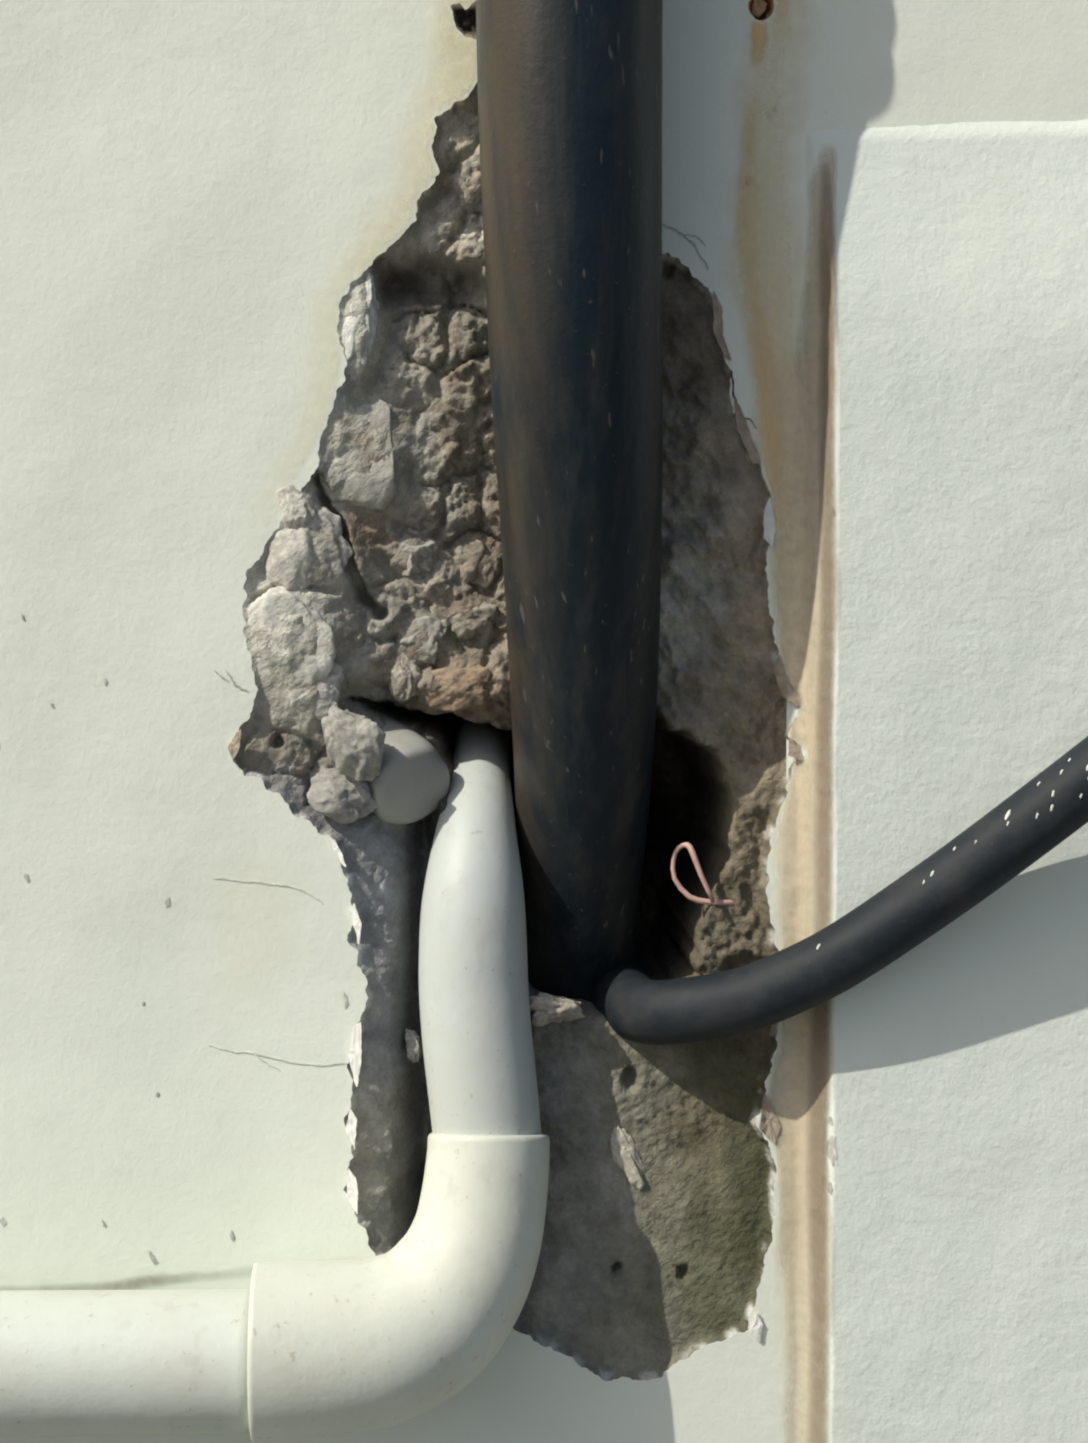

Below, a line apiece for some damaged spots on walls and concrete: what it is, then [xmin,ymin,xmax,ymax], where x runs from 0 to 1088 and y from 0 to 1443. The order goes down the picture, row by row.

spalling [228,83,517,1256]
spalling [636,252,804,980]
crack [208,1044,346,1070]
spalling [513,981,781,1381]